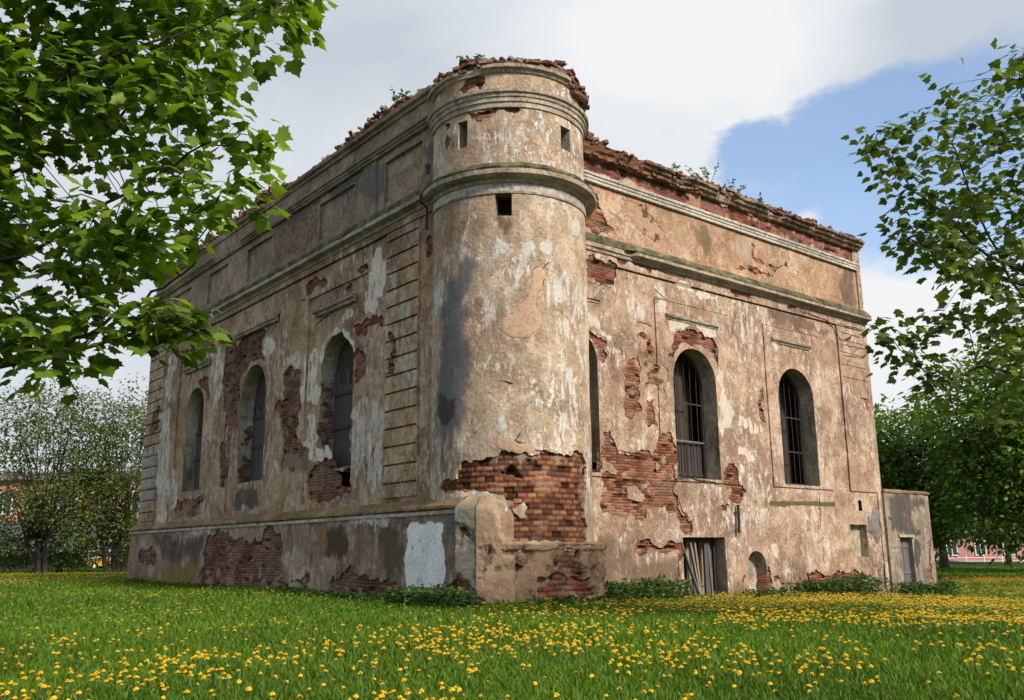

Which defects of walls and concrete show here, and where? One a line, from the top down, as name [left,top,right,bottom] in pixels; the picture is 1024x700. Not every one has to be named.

spalling [583,131,862,261]
spalling [141,328,275,523]
spalling [274,246,399,503]
damp [434,257,474,463]
spalling [442,254,765,578]
spalling [139,547,157,567]
spalling [198,526,311,587]